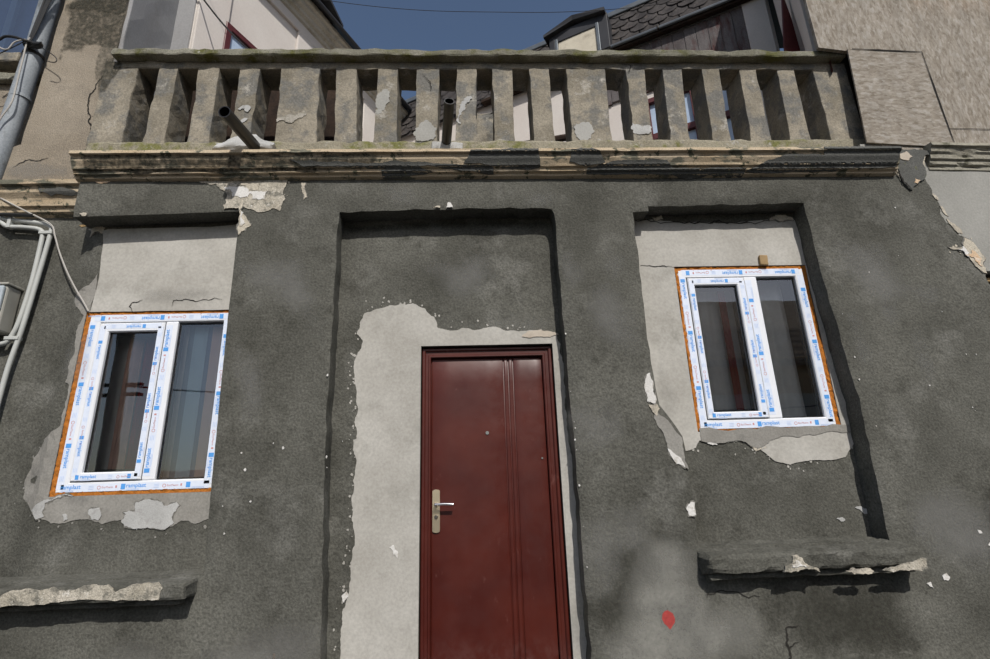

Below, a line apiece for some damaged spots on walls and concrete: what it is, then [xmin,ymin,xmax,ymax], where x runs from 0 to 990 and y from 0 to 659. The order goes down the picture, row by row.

crack [85,77,102,150]
flaking render [199,180,308,236]
peeling [643,373,660,416]
peeling [667,448,686,469]
peeling [30,492,73,529]
peeling [88,507,104,531]
peeling [121,498,181,538]
flaking render [783,555,820,573]
flaking render [0,582,162,608]